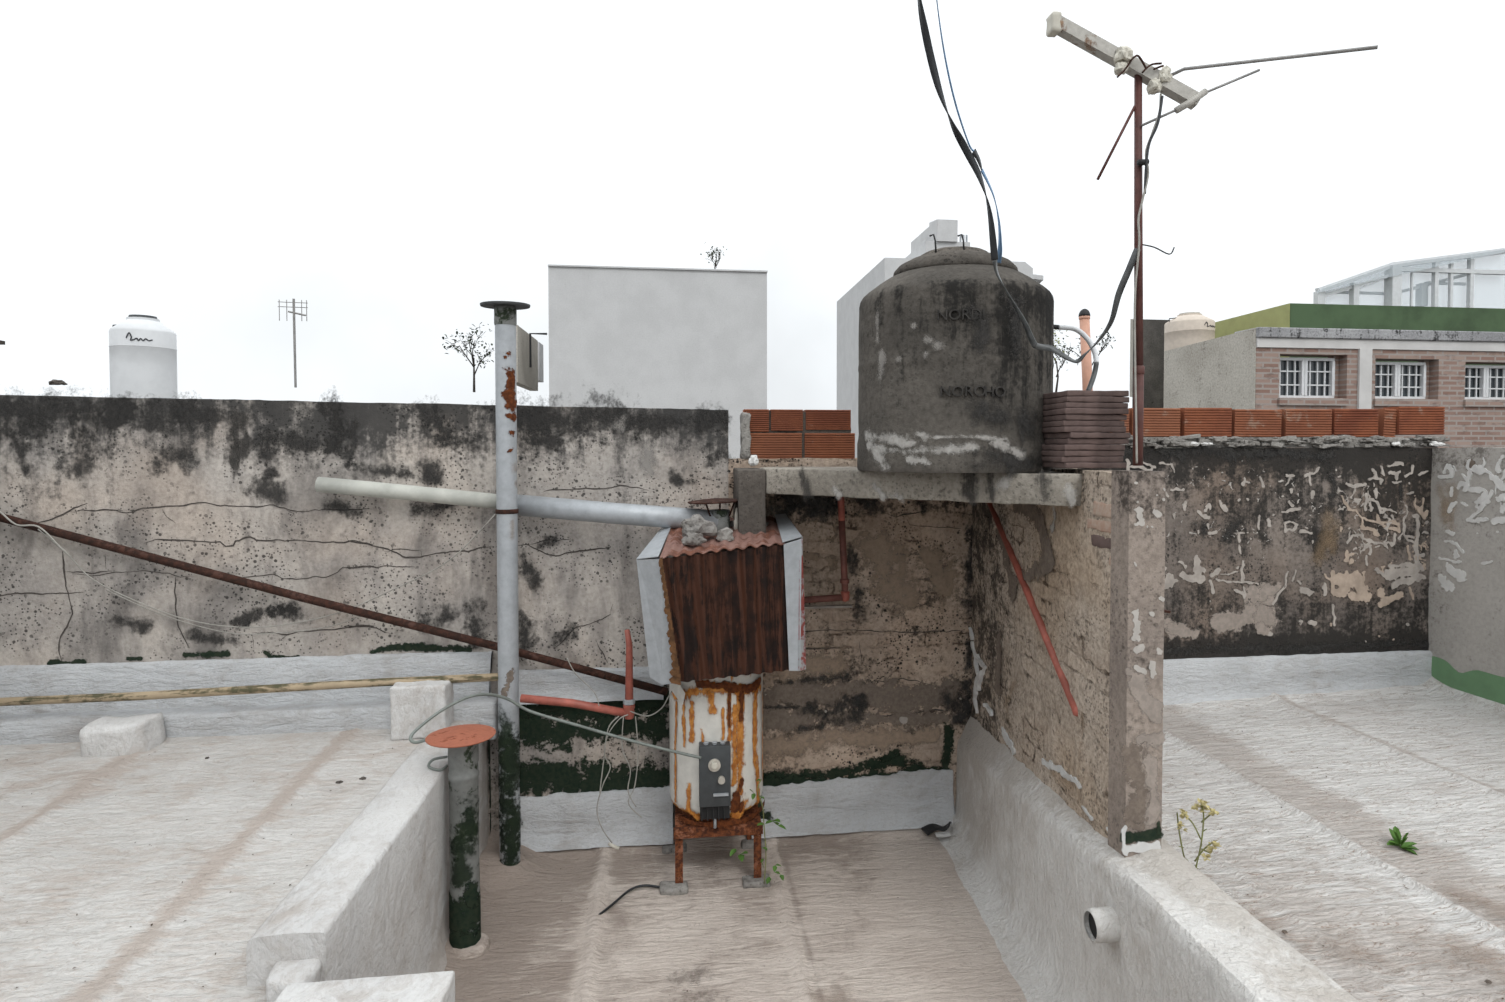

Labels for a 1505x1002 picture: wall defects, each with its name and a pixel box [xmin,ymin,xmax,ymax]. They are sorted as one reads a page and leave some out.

leakage [0,389,479,506]
rust [501,351,517,453]
leakage [187,602,303,645]
crack [0,502,612,663]
leakage [324,500,362,518]
leakage [410,501,456,515]
leakage [518,536,558,589]
leakage [501,610,578,697]
leakage [763,640,973,767]
leakage [766,401,1076,624]
flaking render [1087,501,1111,565]
flaking render [1125,455,1505,679]